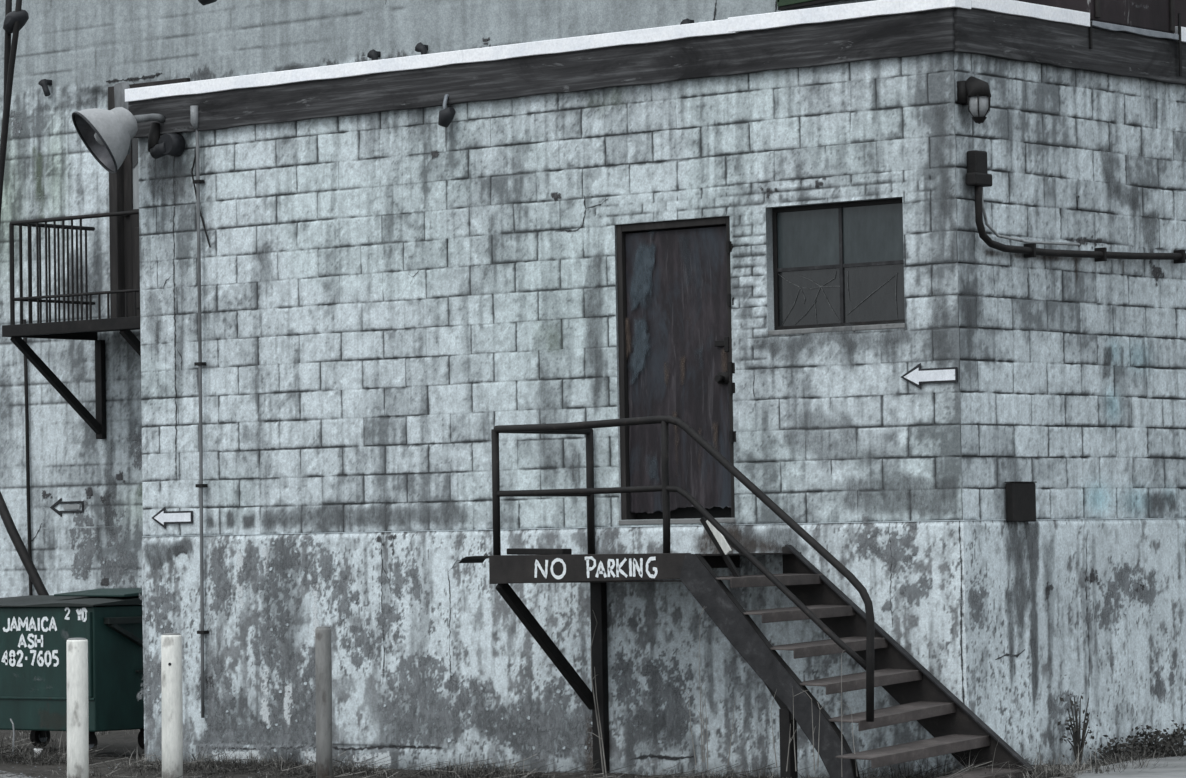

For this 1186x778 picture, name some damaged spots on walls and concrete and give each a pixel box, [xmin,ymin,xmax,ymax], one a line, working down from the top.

crack [561,196,606,232]
damp [1101,148,1157,269]
damp [98,447,116,536]
peeling [856,516,933,612]
peeling [958,575,991,634]
peeling [1086,556,1162,635]
peeling [137,658,162,722]
peeling [197,532,593,762]
peeling [1047,678,1080,743]
peeling [1146,666,1175,702]